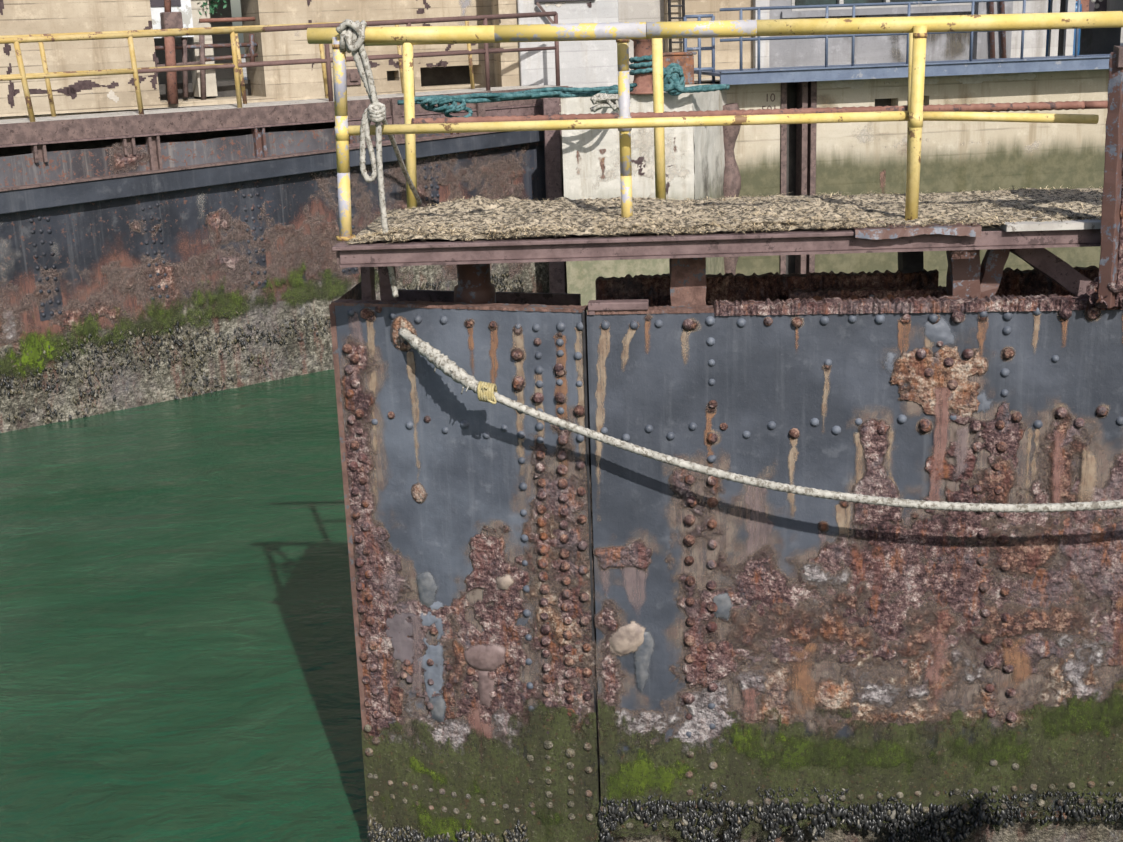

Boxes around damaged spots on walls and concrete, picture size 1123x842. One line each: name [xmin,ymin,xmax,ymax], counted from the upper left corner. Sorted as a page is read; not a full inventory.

rust [0,143,531,346]
rust [464,318,498,384]
rust [340,310,420,739]
rust [411,483,427,503]
rust [511,313,1123,753]